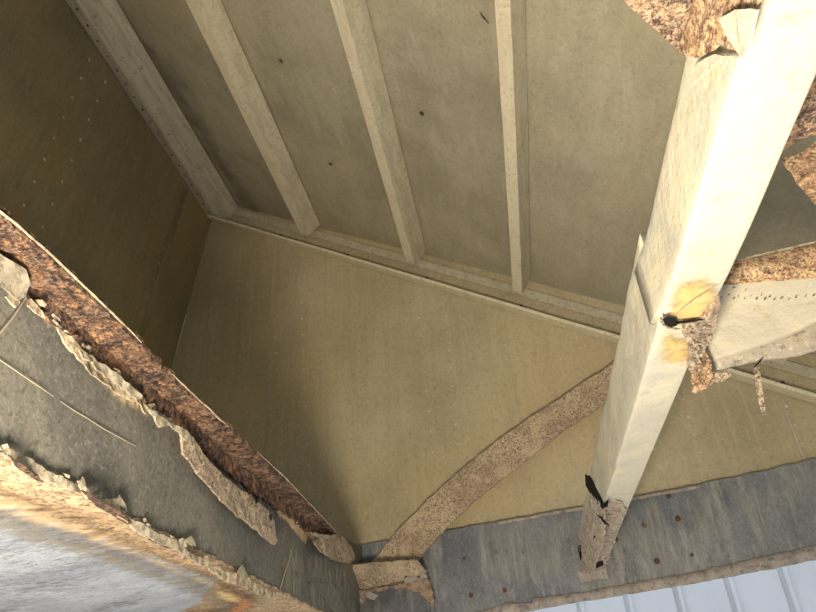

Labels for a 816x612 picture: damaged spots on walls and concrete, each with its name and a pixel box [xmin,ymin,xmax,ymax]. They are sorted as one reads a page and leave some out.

spalling [677,0,762,86]
peeling [0,254,280,545]
peeling [0,444,278,600]
spalling [578,474,628,572]
peeling [359,576,421,605]